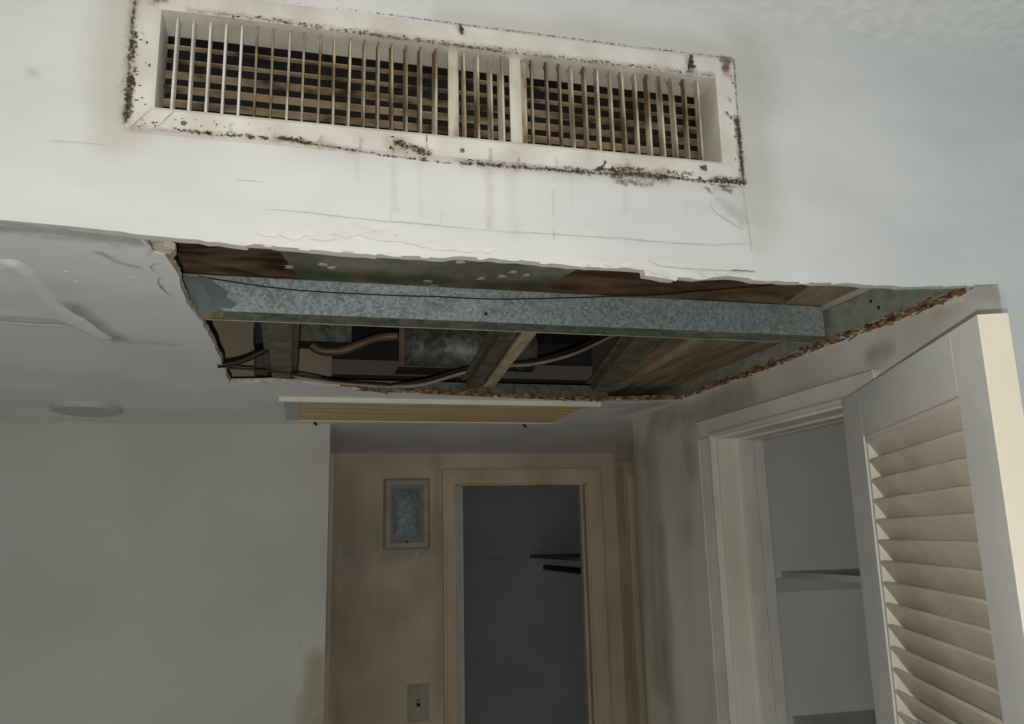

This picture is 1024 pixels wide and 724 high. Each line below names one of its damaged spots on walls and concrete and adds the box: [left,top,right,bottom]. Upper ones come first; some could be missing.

damp [122,2,158,127]
damp [223,13,651,69]
damp [174,48,746,185]
peeling [571,259,772,282]
spalling [342,285,976,402]